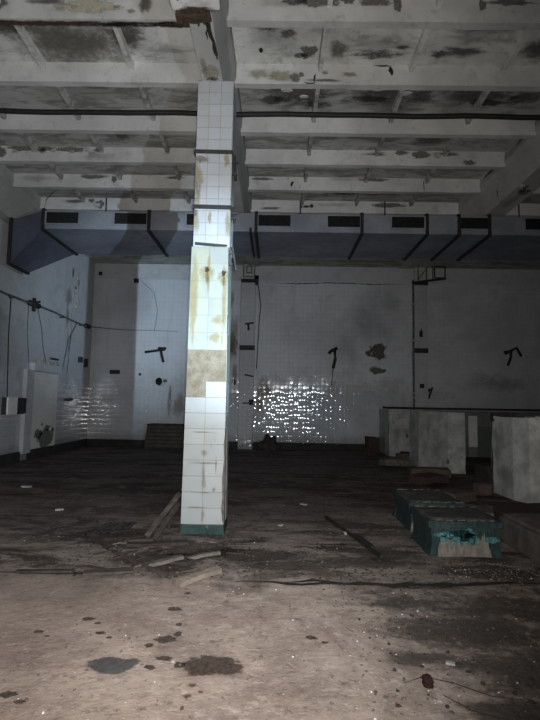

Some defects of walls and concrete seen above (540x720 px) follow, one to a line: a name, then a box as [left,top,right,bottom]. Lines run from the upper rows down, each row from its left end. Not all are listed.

water stain [0,25,141,62]
water stain [262,89,330,107]
water stain [351,90,435,109]
water stain [453,91,539,106]
peeling [186,349,226,397]
spalling [365,343,387,375]